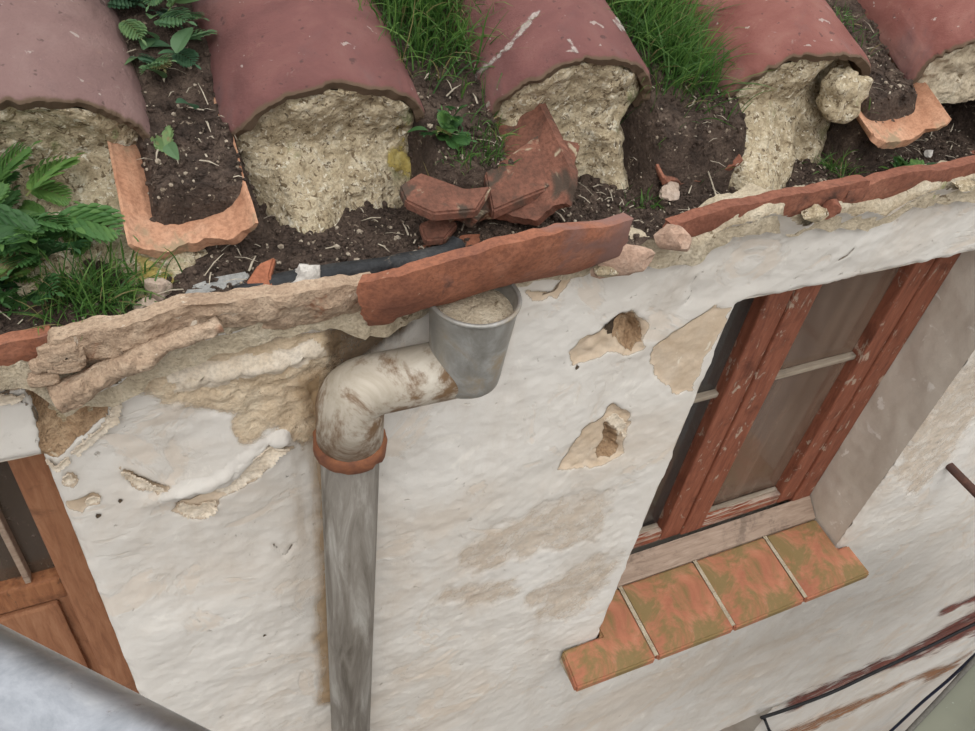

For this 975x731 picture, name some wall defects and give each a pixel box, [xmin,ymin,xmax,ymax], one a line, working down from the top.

peeling [569,305,732,395]
spalling [0,272,371,519]
spalling [558,403,631,470]
rust [786,653,971,731]
rust [786,597,975,713]